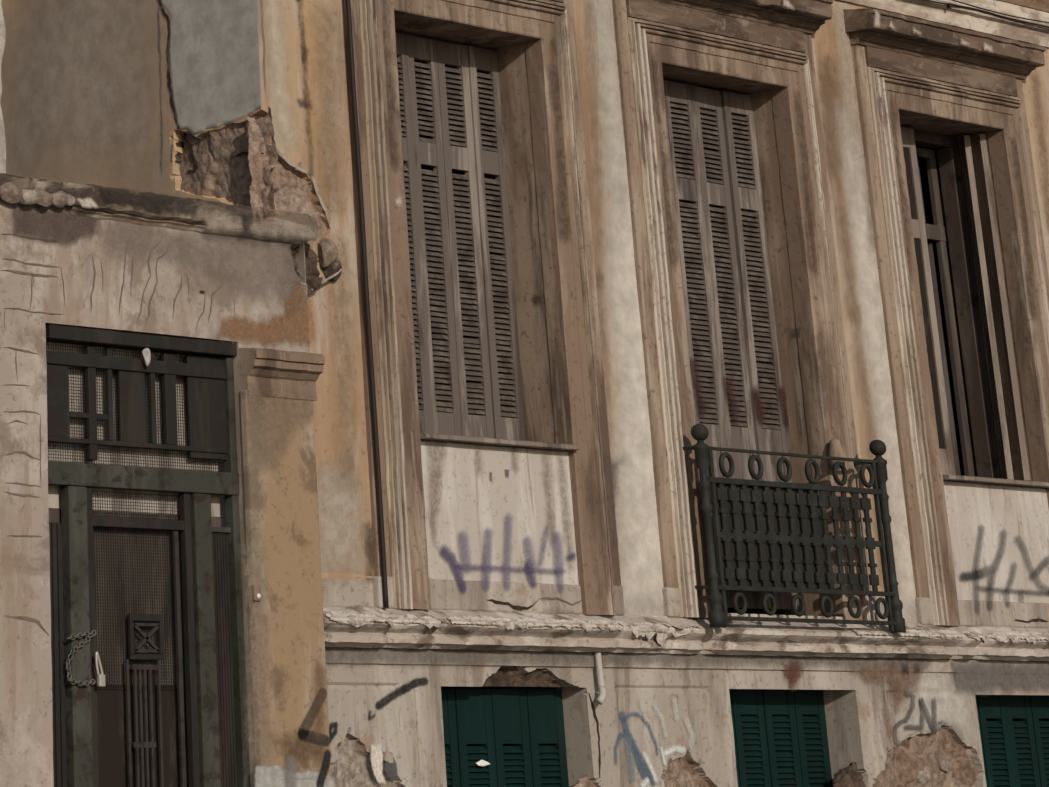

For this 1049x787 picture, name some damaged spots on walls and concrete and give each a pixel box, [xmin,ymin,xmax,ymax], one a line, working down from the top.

crack [157,0,196,176]
spalling [179,106,342,297]
crack [91,246,235,329]
crack [1,233,65,498]
damp [246,395,312,758]
spalling [483,665,562,687]
spalling [331,735,398,787]
spalling [661,756,712,787]
spalling [834,726,979,787]